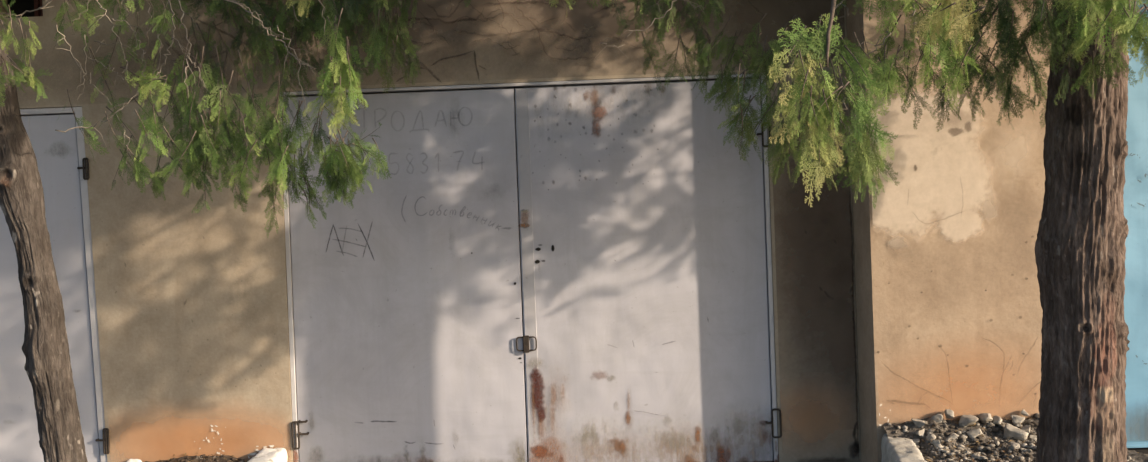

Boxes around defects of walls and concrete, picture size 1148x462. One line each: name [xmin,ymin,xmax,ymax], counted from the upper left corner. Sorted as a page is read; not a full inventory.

corrosion [593,94,606,136]
corrosion [531,369,563,462]
leakage [120,419,281,462]